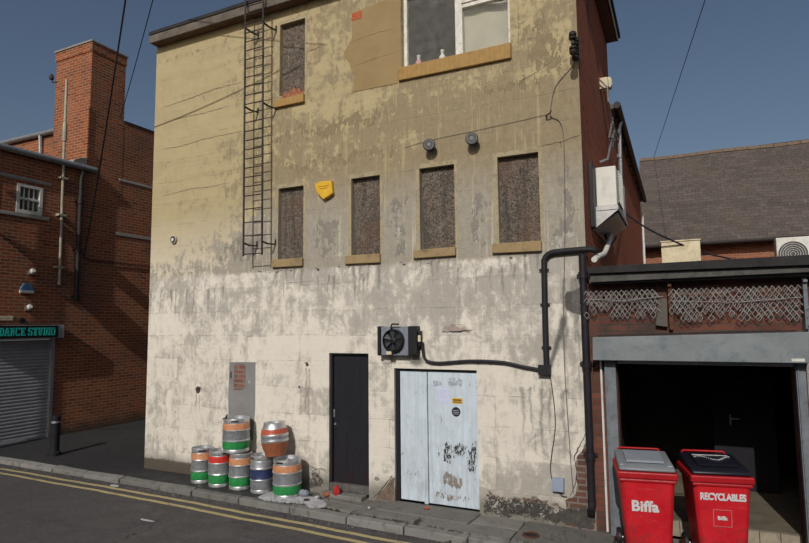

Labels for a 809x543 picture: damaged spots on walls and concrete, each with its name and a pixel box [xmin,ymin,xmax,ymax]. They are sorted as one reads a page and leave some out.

peeling [484,13,568,96]
peeling [275,108,397,176]
peeling [550,167,575,249]
peeling [219,233,267,262]
water stain [550,317,566,365]